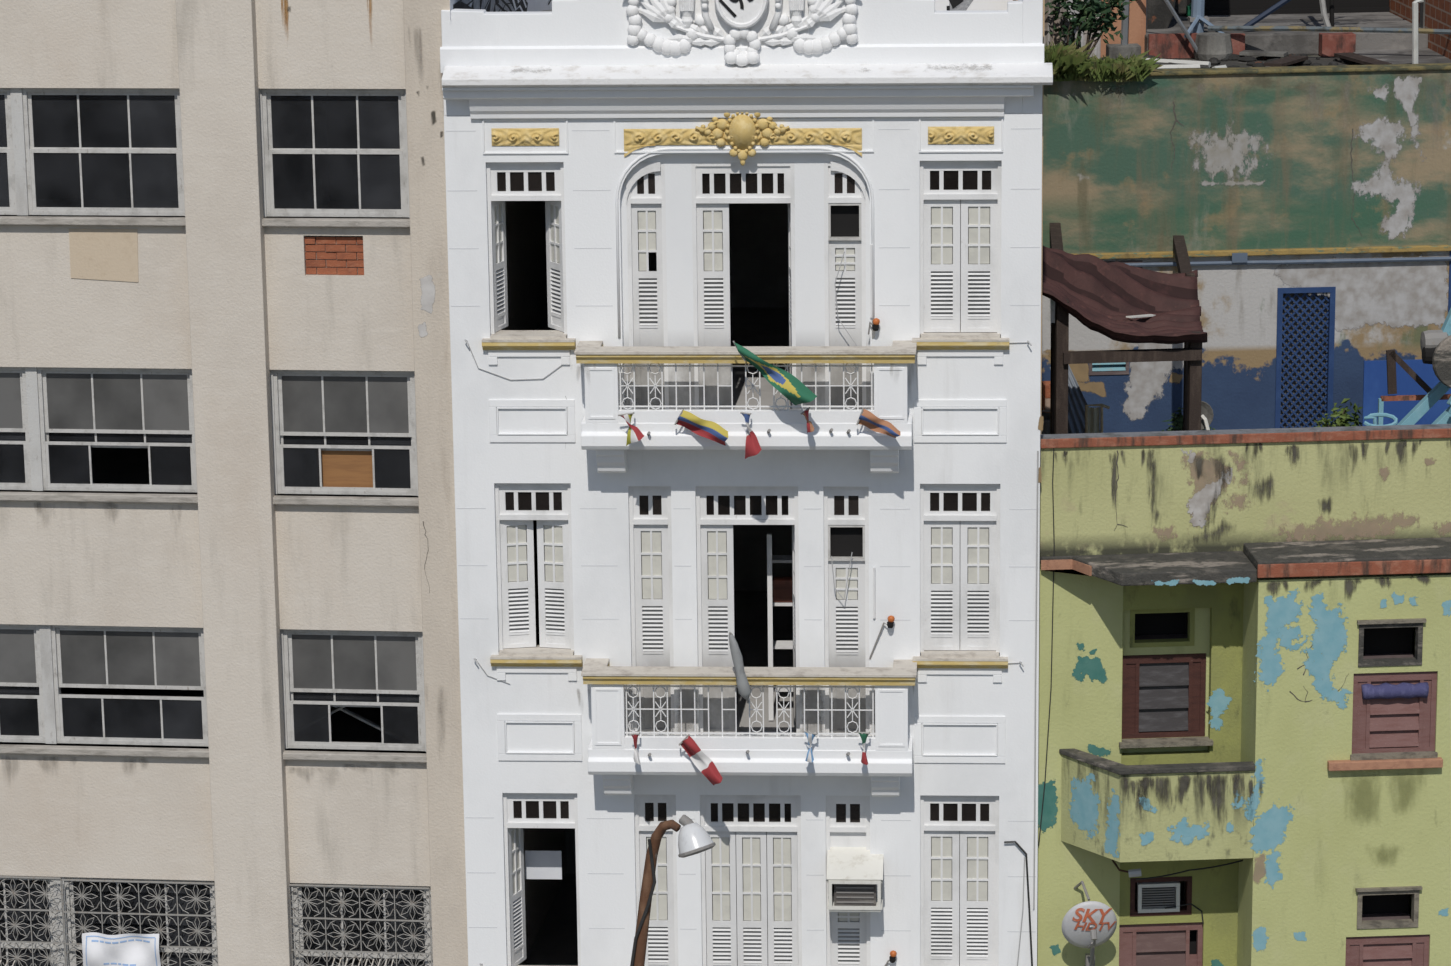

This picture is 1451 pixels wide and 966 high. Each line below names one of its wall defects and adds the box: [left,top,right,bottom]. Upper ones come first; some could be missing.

spalling [1189,121,1269,186]
spalling [1274,75,1449,332]
leakage [1112,451,1123,500]
leakage [1142,450,1159,518]
leakage [1196,457,1230,484]
leakage [1198,500,1230,539]
leakage [1257,477,1273,497]
leakage [1385,440,1421,461]
peeling [1072,643,1108,684]
peeling [1253,588,1353,710]
peeling [1038,773,1158,859]
peeling [1139,759,1294,889]